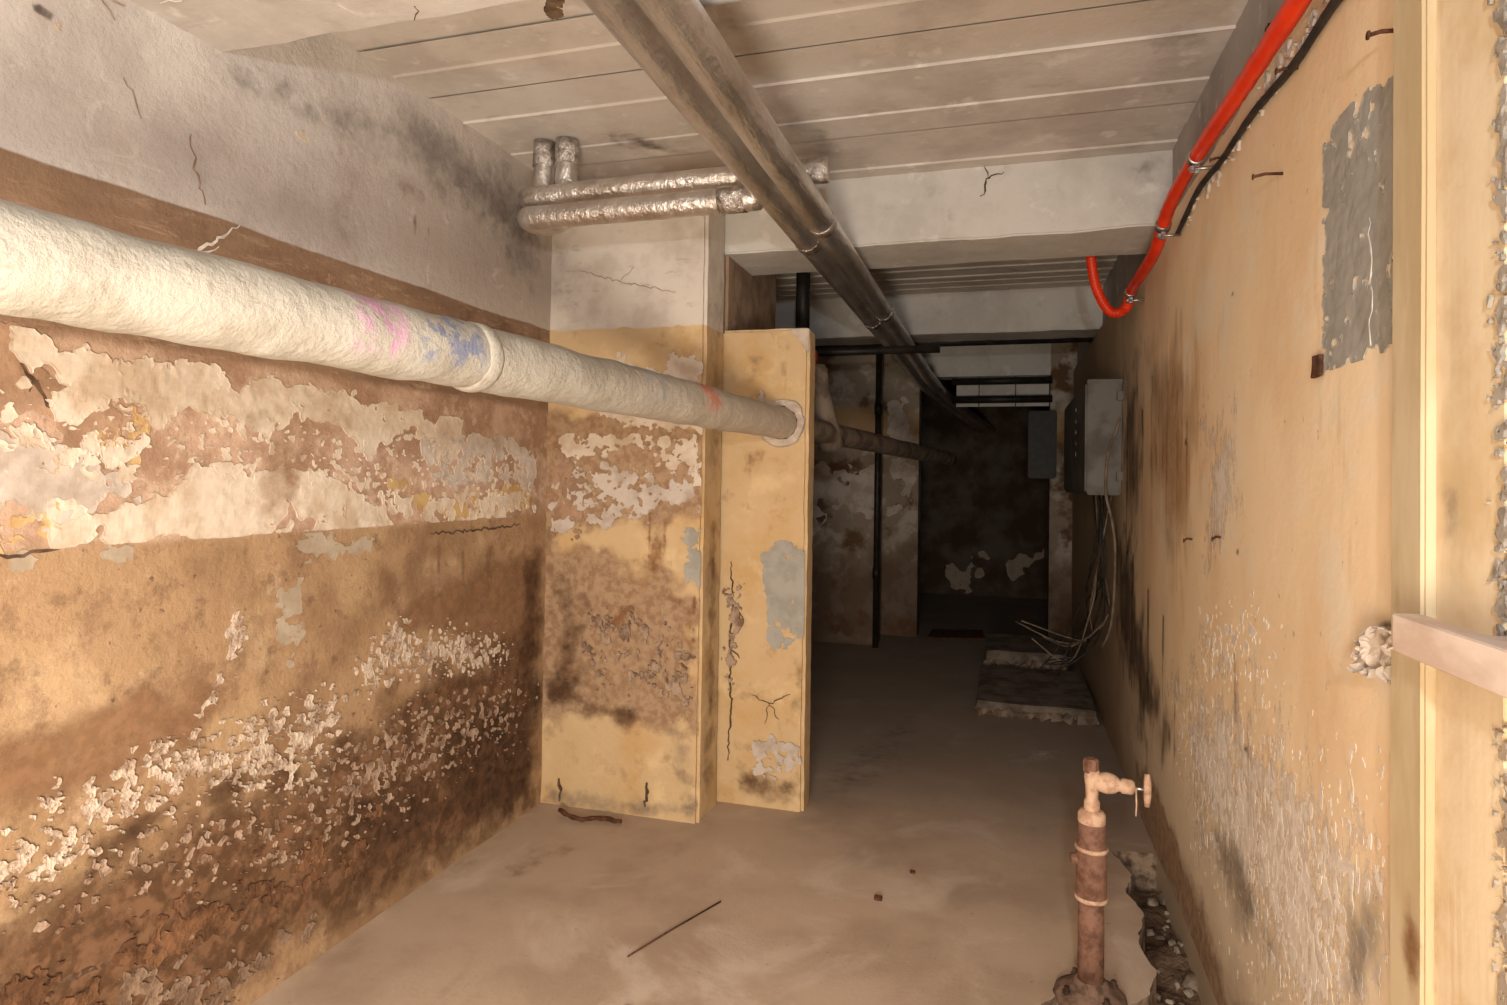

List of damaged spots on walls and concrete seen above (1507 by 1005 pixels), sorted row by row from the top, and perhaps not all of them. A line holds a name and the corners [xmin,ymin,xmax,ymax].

crack [189,134,241,253]
flaking render [1321,76,1393,372]
peeling [0,322,704,668]
damp [0,412,714,1005]
flaking render [581,606,696,708]
flaking render [721,583,745,695]
peeling [750,734,802,781]
peeling [760,396,917,650]
peeling [945,549,1044,593]
damp [1115,392,1384,1005]